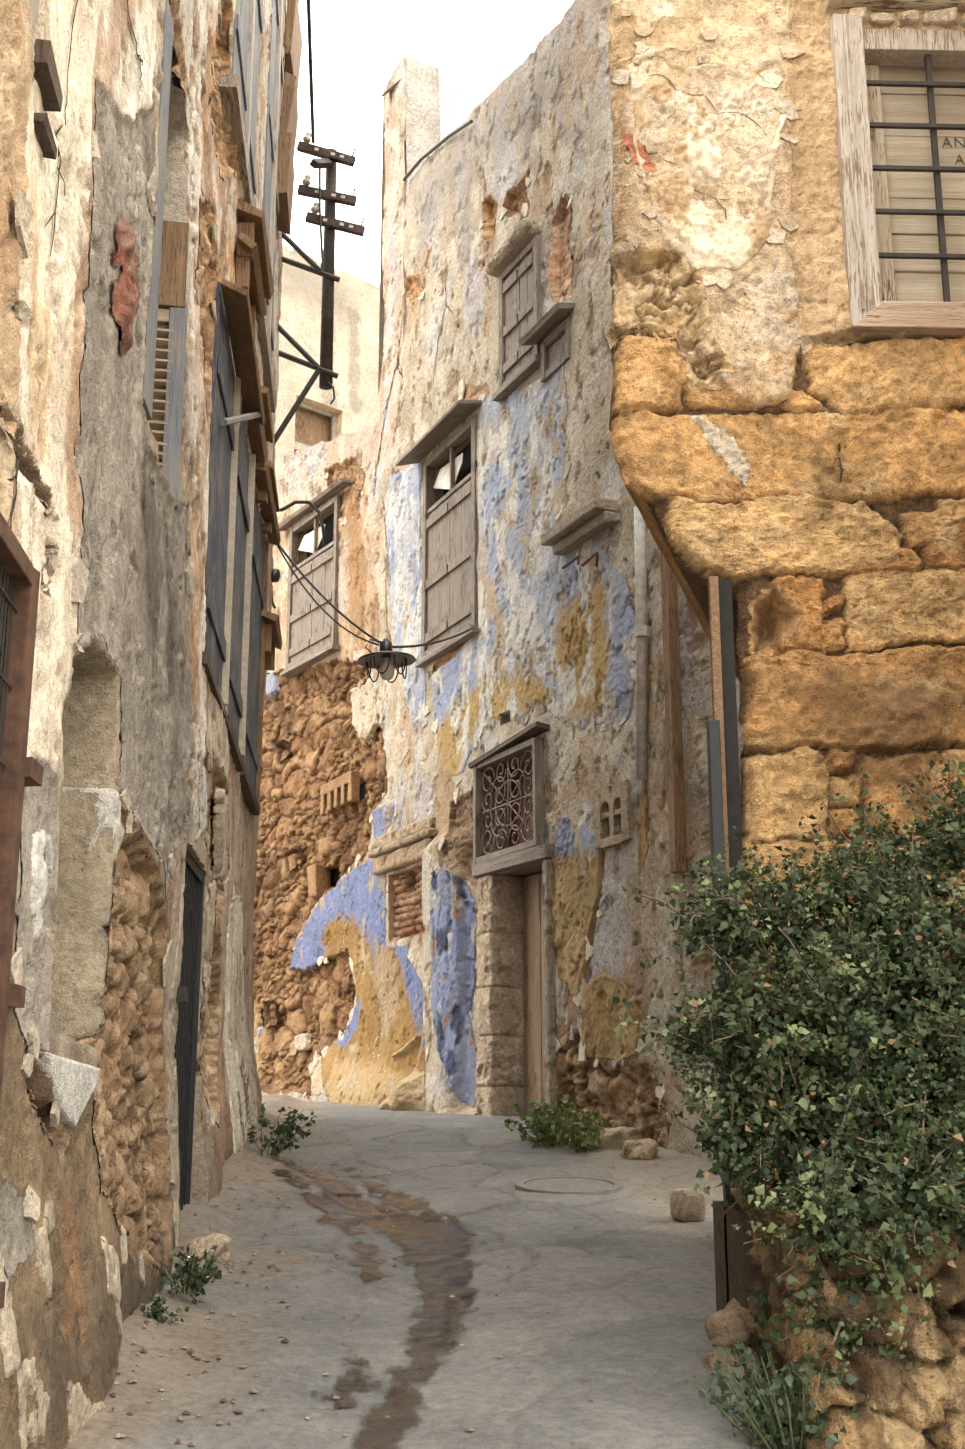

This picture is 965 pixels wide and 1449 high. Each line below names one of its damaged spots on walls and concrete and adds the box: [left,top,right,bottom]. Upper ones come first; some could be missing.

spalling [0,0,34,522]
crack [45,0,78,256]
spalling [169,0,190,105]
spalling [208,0,239,182]
crack [660,156,735,220]
crack [650,74,767,136]
spalling [604,0,862,391]
flaking render [691,415,753,486]
peeling [10,78,650,1334]
spalling [746,584,803,657]
spalling [545,811,669,1148]
leakage [272,1155,477,1449]